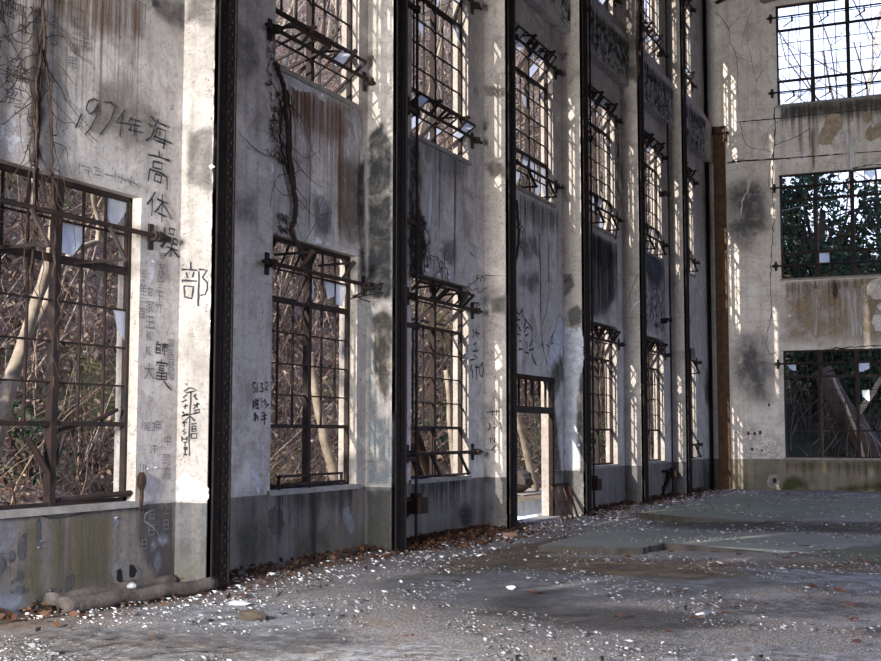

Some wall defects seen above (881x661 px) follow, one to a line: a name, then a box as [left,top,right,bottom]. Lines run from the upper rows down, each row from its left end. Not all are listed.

flaking render [818,113,843,145]
damp [783,98,881,123]
flaking render [863,112,881,142]
corrosion [322,106,353,229]
damp [730,186,765,238]
damp [788,282,881,338]
flaking render [866,278,881,331]
spalling [0,519,76,609]